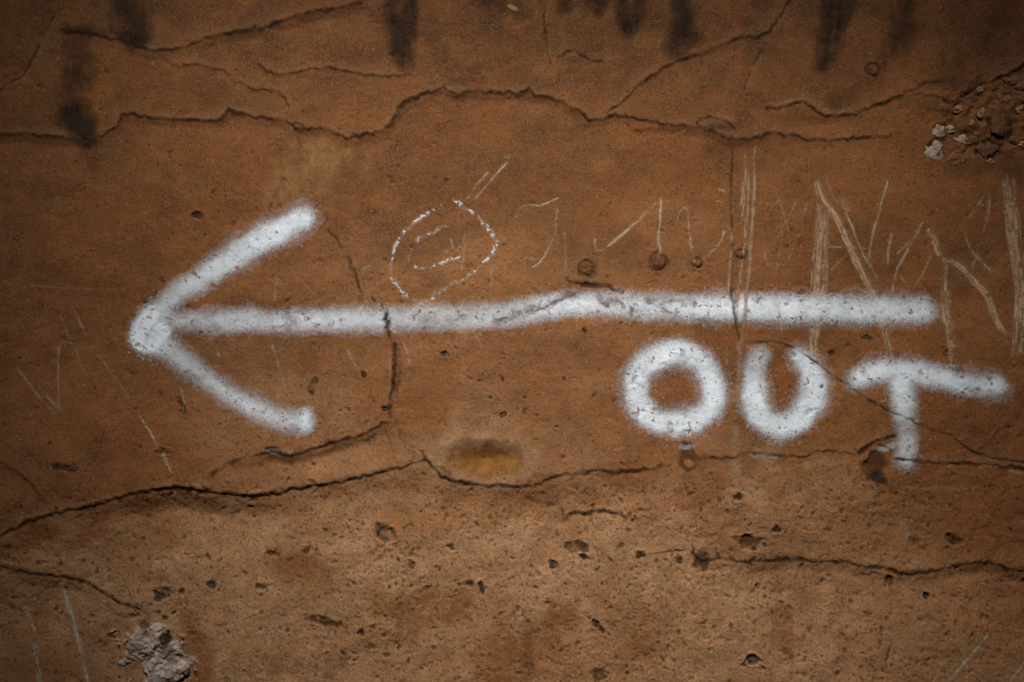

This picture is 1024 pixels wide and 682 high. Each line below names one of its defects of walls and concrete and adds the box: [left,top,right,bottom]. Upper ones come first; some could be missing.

damp [391,0,416,68]
damp [59,105,96,140]
crack [336,88,455,140]
crack [487,88,900,183]
spalling [924,76,1024,166]
crack [499,281,633,321]
crack [313,237,397,448]
crack [731,289,843,382]
crack [790,399,1024,470]
crack [390,452,558,488]
crack [691,548,823,564]
spalling [119,619,199,682]